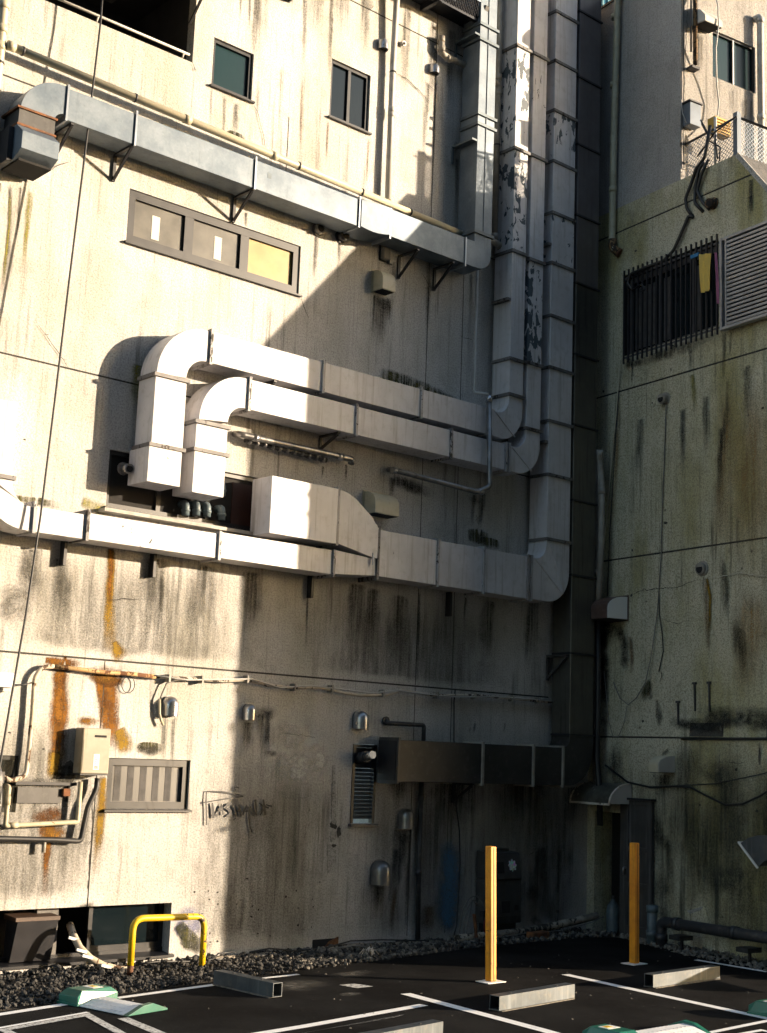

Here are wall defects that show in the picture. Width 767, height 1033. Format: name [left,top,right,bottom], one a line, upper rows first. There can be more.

damp [0,183,32,268]
damp [145,559,164,610]
damp [198,566,213,610]
damp [243,572,257,612]
rust [46,549,156,776]
rust [95,778,106,850]